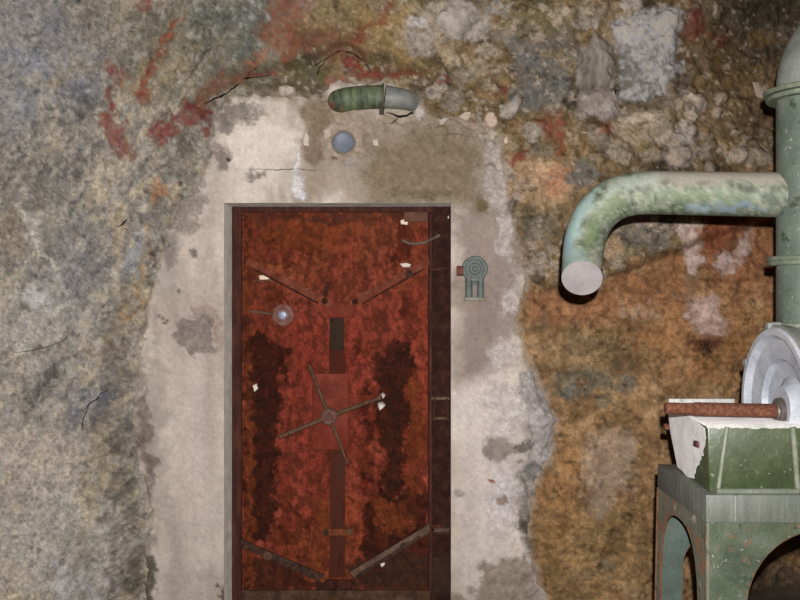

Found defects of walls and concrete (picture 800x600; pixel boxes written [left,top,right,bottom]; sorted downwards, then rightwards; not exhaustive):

corrosion [100,89,136,158]
corrosion [134,18,183,103]
crack [197,66,271,121]
corrosion [147,0,420,145]
leakage [292,97,331,201]
crack [316,50,370,76]
crack [386,111,471,137]
corrosion [386,223,412,269]
corrosion [242,220,315,590]
corrosion [349,298,428,561]
leakage [482,384,542,549]